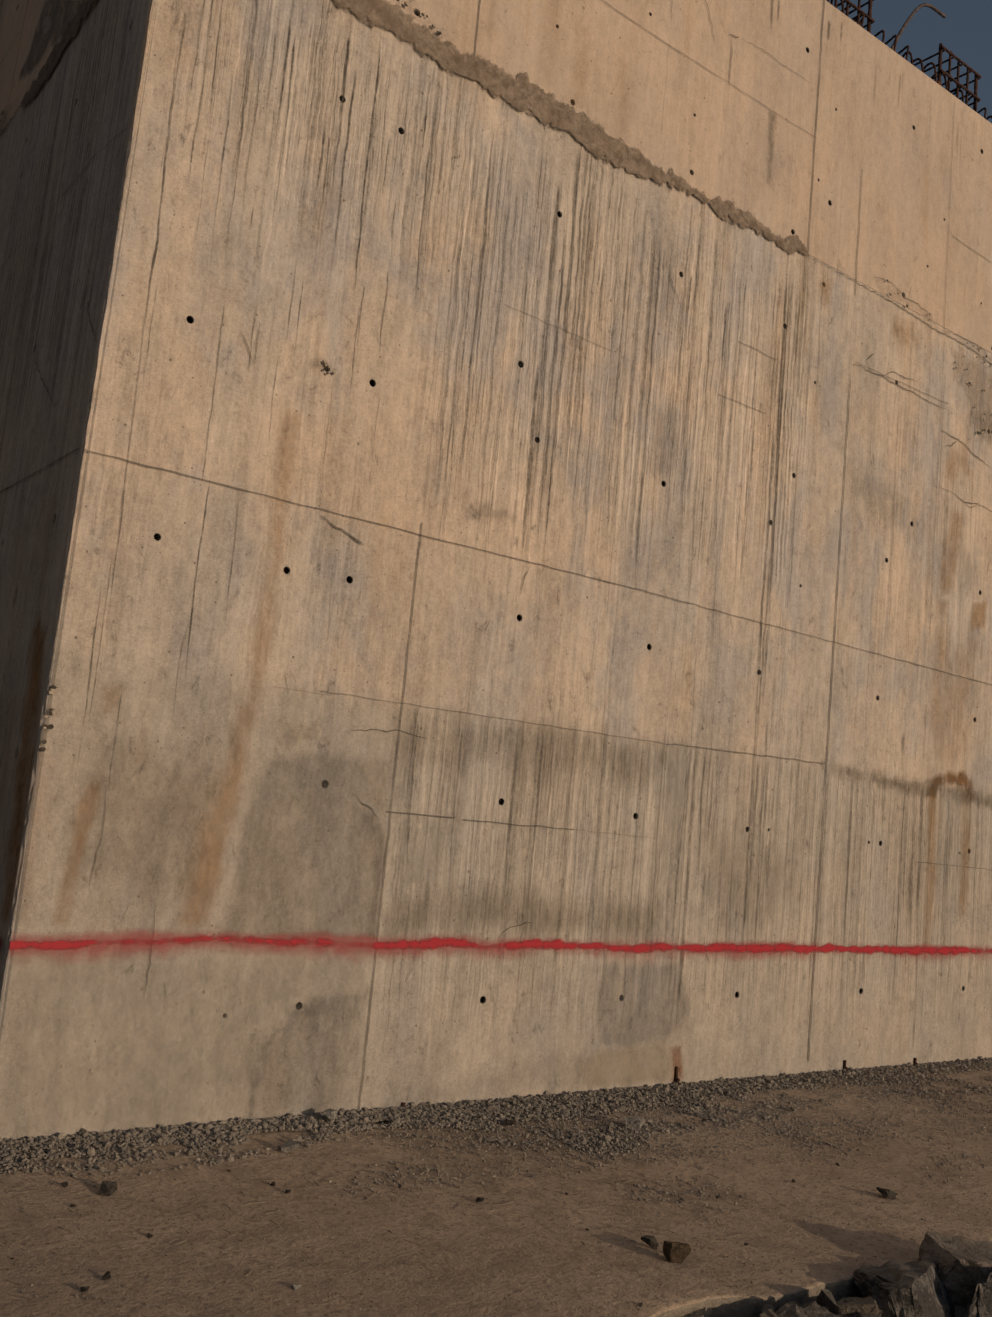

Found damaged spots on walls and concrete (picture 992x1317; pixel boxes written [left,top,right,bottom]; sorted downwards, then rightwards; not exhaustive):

water stain [20,0,80,77]
crack [808,255,992,364]
corrosion [929,773,974,798]